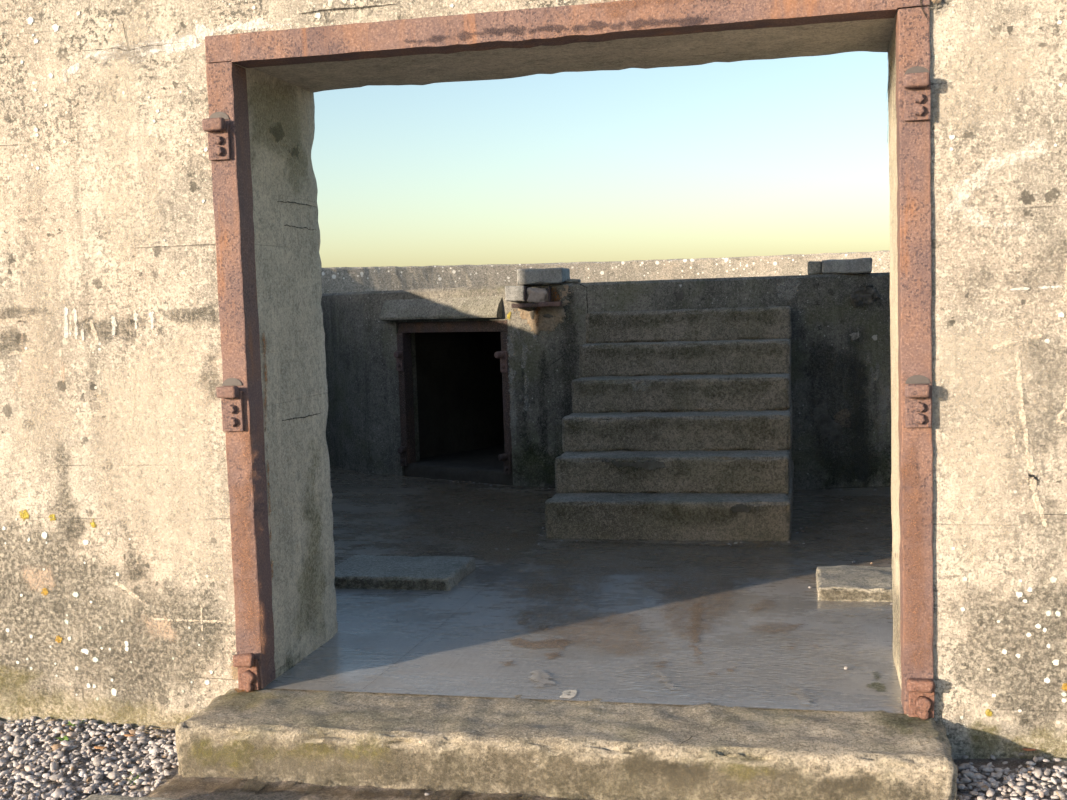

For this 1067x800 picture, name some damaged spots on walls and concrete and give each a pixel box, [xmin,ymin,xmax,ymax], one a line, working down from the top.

rust [404,16,707,42]
rust [511,286,562,308]
leakage [0,450,223,719]
leakage [334,577,445,591]
leakage [820,589,893,601]
leakage [961,585,1067,727]